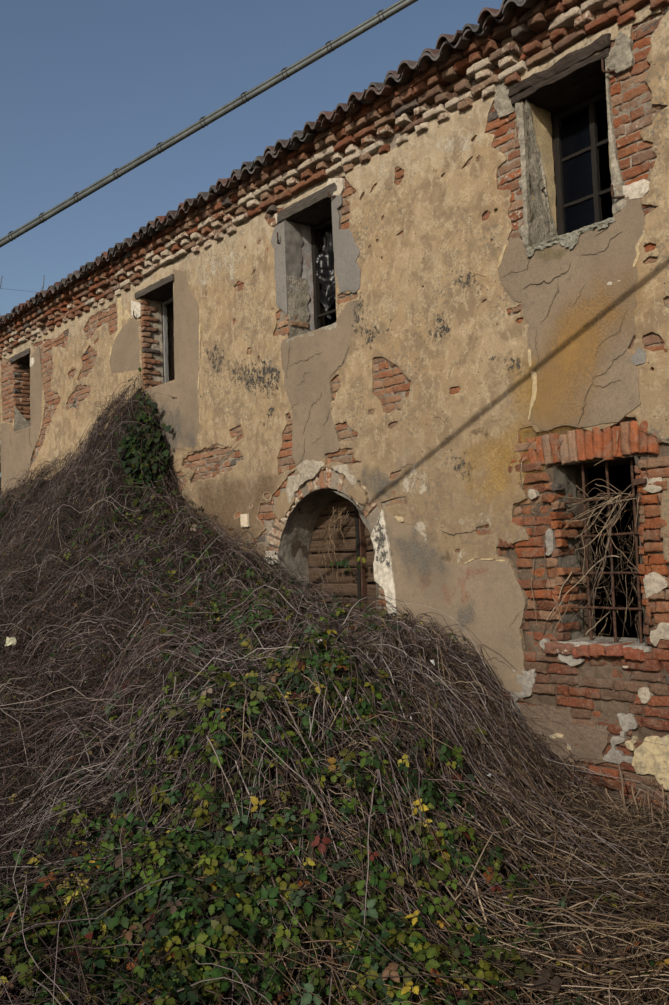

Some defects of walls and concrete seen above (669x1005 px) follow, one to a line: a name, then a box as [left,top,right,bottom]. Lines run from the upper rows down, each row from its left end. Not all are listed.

spalling [609,4,669,186]
spalling [473,103,533,267]
spalling [1,358,18,423]
spalling [32,297,143,462]
spalling [174,425,244,495]
water stain [203,344,280,426]
spalling [235,413,407,569]
spalling [368,357,411,429]
crack [471,223,621,371]
crack [577,315,626,426]
spalling [629,332,668,353]
spalling [464,349,669,836]